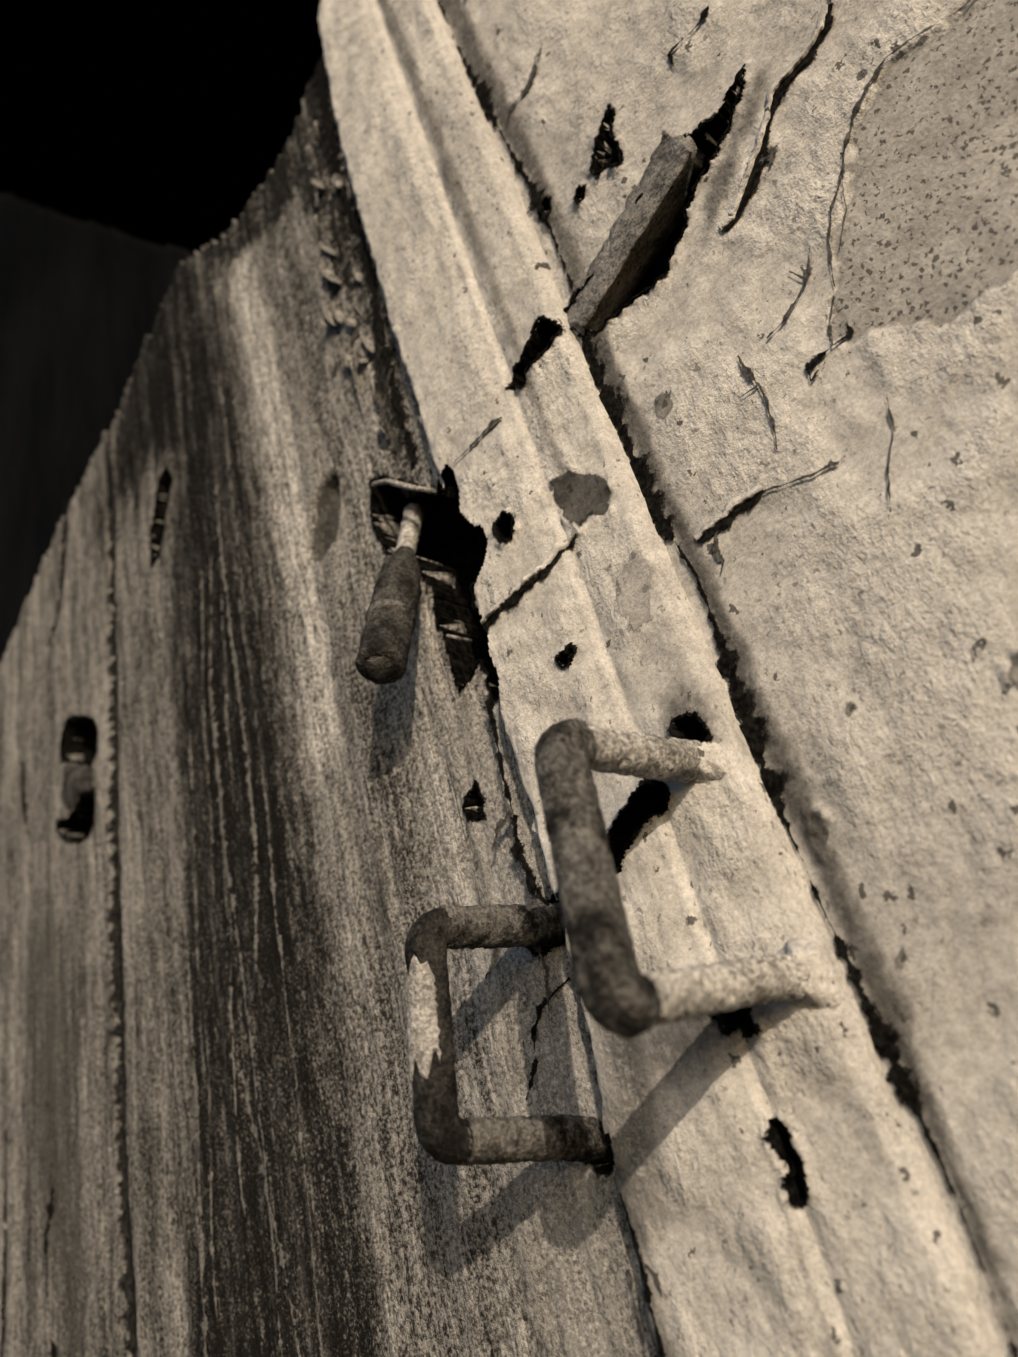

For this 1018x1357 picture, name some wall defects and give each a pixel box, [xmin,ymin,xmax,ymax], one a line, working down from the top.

spalling [589,103,624,176]
peeling [830,0,1018,342]
crack [437,0,1018,1357]
rust [633,1014,739,1071]
spalling [710,1006,763,1043]
spalling [762,1117,810,1209]